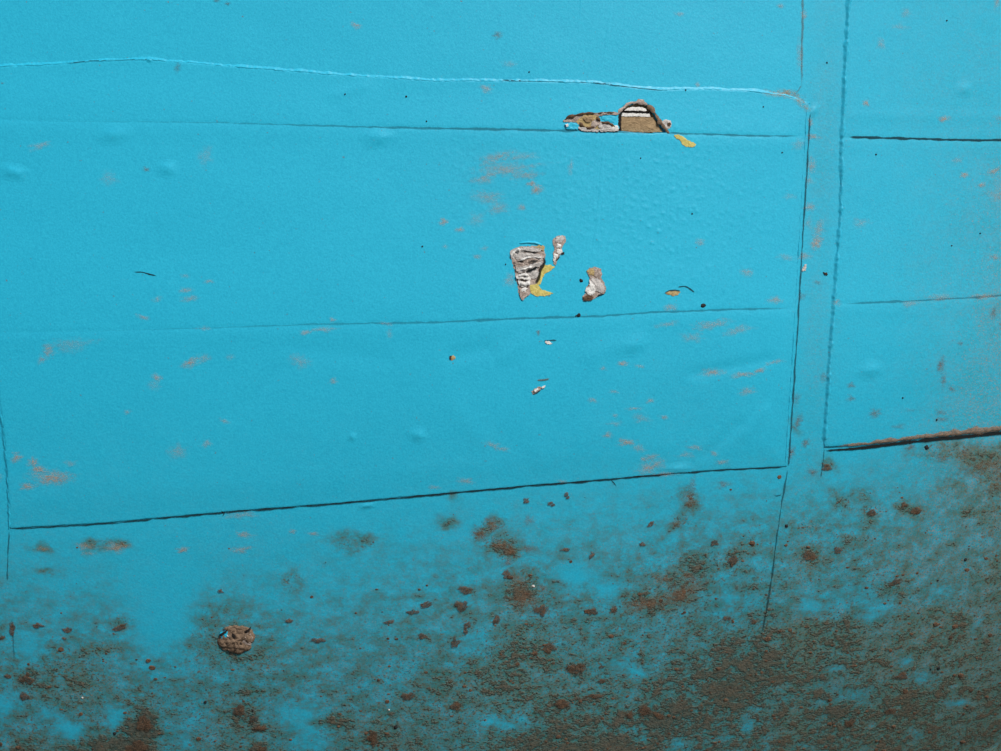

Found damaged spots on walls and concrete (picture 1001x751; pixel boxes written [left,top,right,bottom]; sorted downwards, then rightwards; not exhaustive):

peeling [563,99,696,147]
peeling [510,235,566,300]
peeling [582,267,606,301]
rust [217,625,255,654]